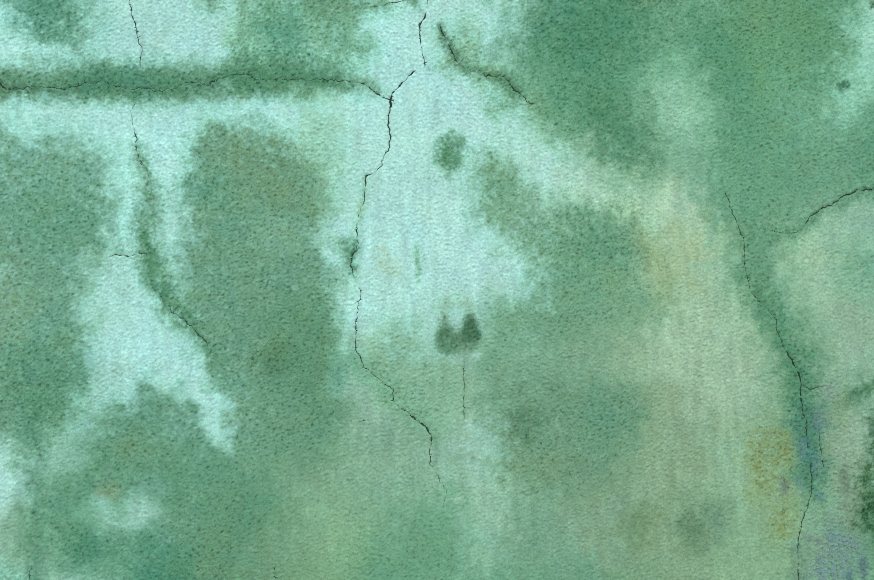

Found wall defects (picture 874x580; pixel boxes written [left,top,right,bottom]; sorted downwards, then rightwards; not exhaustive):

crack [0,0,460,504]
crack [483,73,538,105]
crack [723,188,824,580]
crack [769,187,874,234]